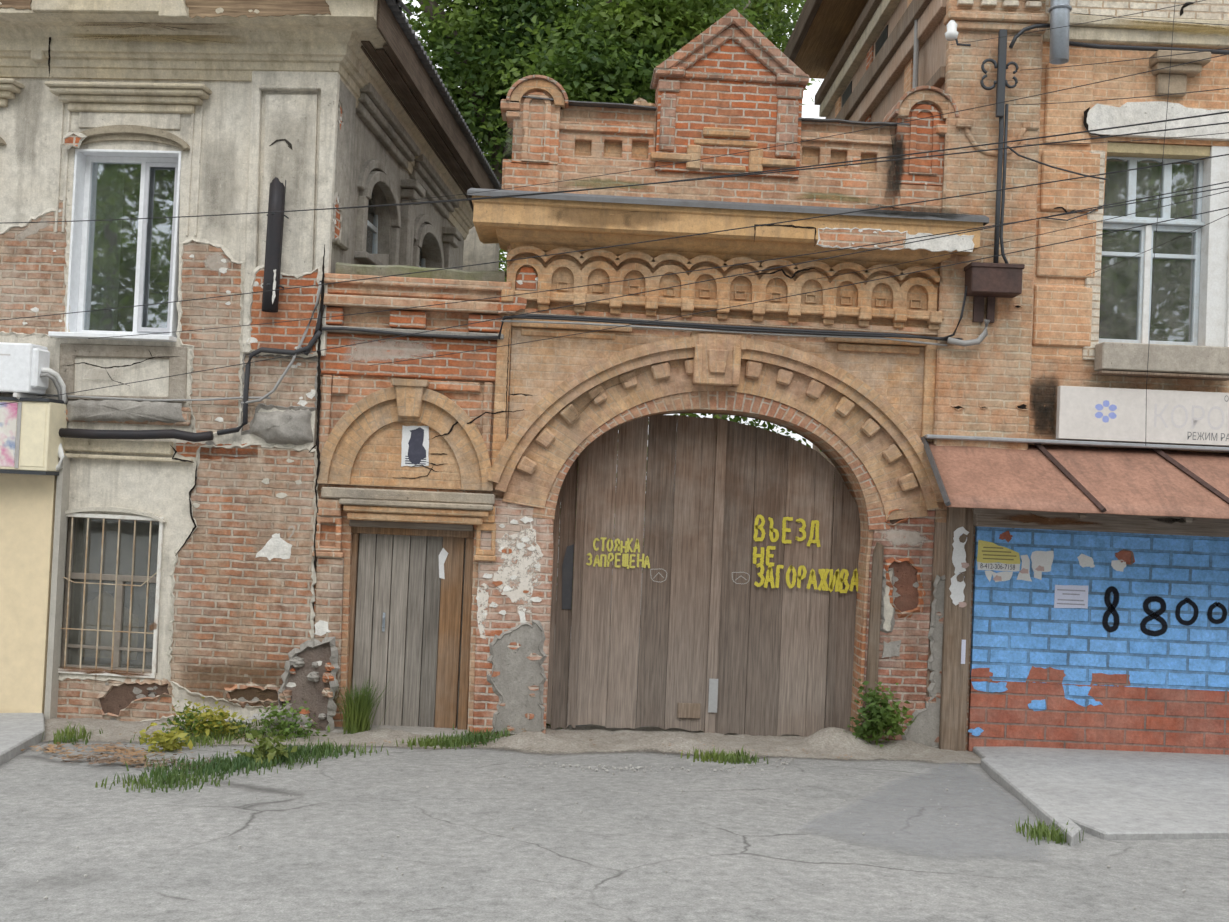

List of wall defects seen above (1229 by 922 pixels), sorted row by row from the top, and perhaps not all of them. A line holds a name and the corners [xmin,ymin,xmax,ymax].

damp [868,137,958,218]
flaking render [0,197,71,340]
crack [63,351,179,386]
crack [392,329,532,479]
flaking render [57,237,340,733]
peeling [476,516,547,736]
spalling [880,557,945,740]
peeling [971,668,1008,693]
peeling [1028,699,1046,711]
peeling [1026,666,1131,707]